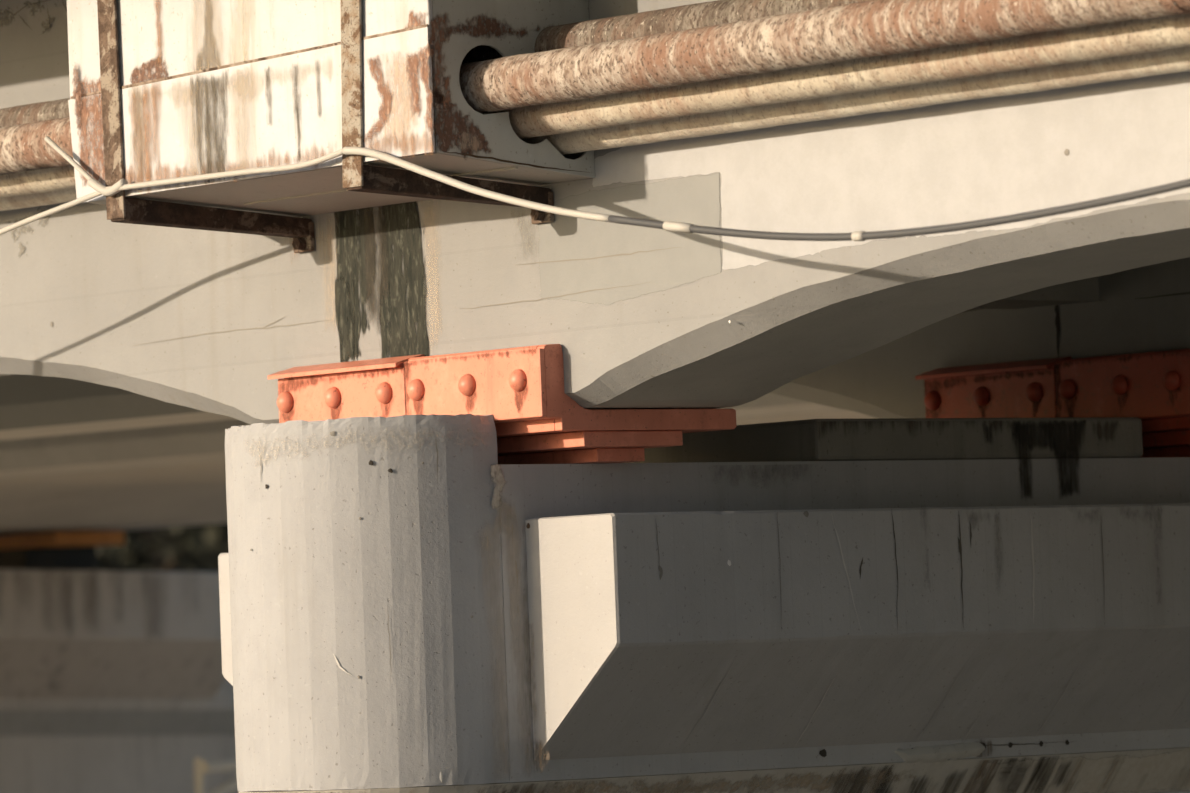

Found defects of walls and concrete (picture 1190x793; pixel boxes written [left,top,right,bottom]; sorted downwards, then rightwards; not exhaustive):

rust [73,66,105,185]
rust [124,0,206,186]
rust [364,12,550,153]
damp [334,201,429,362]
damp [1011,420,1117,497]
damp [942,757,1080,793]